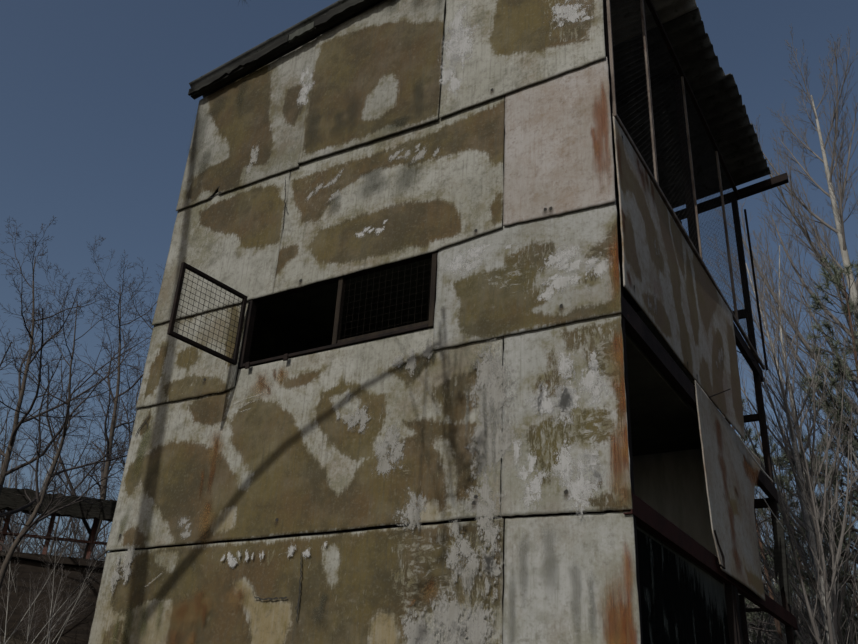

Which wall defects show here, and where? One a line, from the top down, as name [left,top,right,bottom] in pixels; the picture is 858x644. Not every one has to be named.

peeling [552,0,593,28]
corrosion [591,89,621,168]
peeling [393,487,428,533]
peeling [401,338,609,644]
peeling [220,550,264,567]